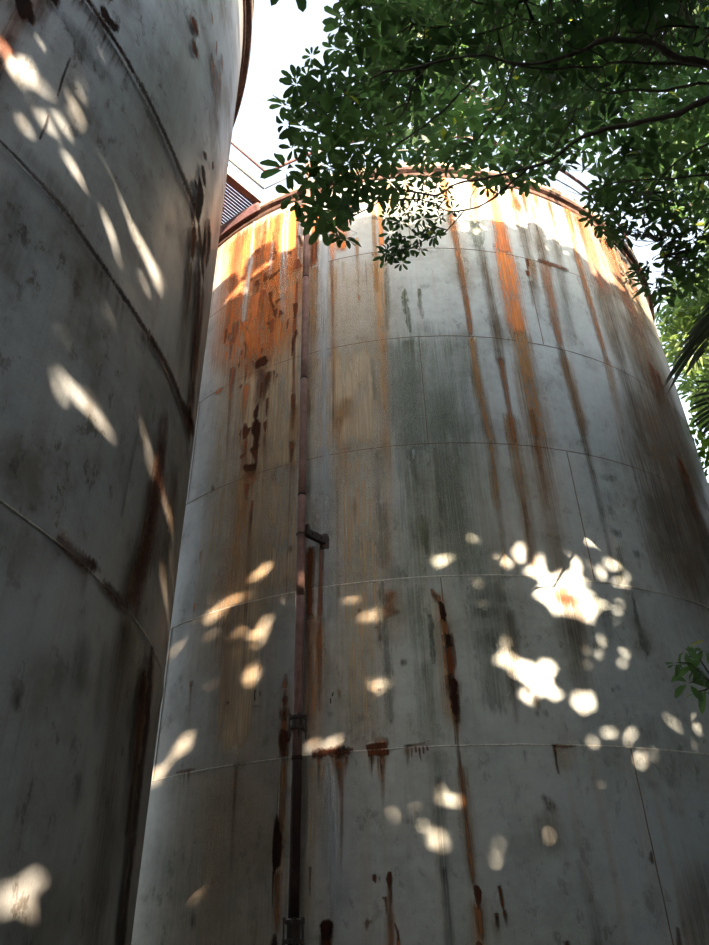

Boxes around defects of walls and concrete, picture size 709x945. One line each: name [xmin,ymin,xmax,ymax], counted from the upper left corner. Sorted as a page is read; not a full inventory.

corrosion [0,0,214,440]
corrosion [102,412,177,612]
corrosion [216,206,319,751]
corrosion [306,544,324,714]
corrosion [366,184,390,410]
corrosion [441,177,500,511]
corrosion [471,182,676,556]
corrosion [118,647,154,945]
corrosion [271,675,291,945]
corrosion [320,919,333,945]
corrosion [312,745,353,806]
corrosion [457,747,484,945]